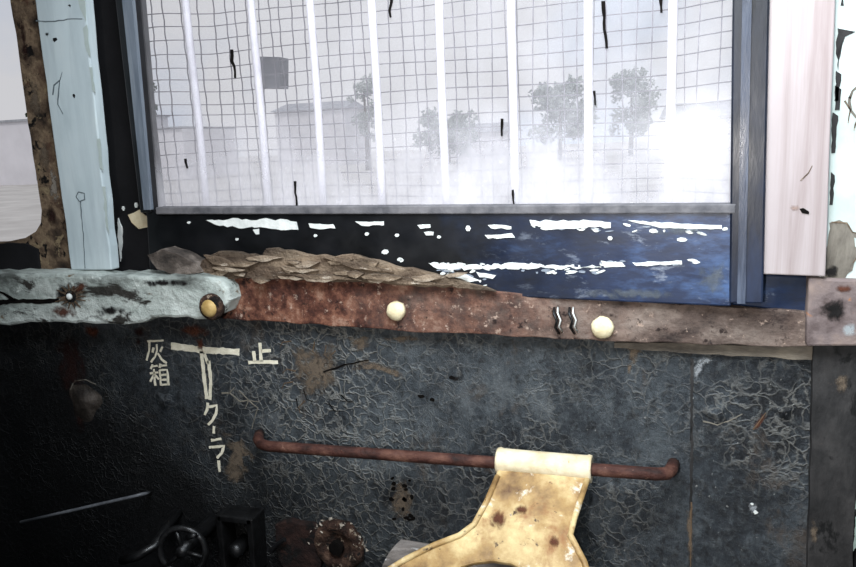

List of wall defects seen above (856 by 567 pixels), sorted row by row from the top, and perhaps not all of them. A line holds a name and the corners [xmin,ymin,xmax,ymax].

peeling [831,28,854,153]
peeling [207,218,335,240]
peeling [355,221,384,236]
peeling [485,224,515,239]
peeling [530,220,613,240]
peeling [623,220,728,242]
peeling [821,220,856,278]
peeling [429,259,700,286]
crack [0,291,59,305]